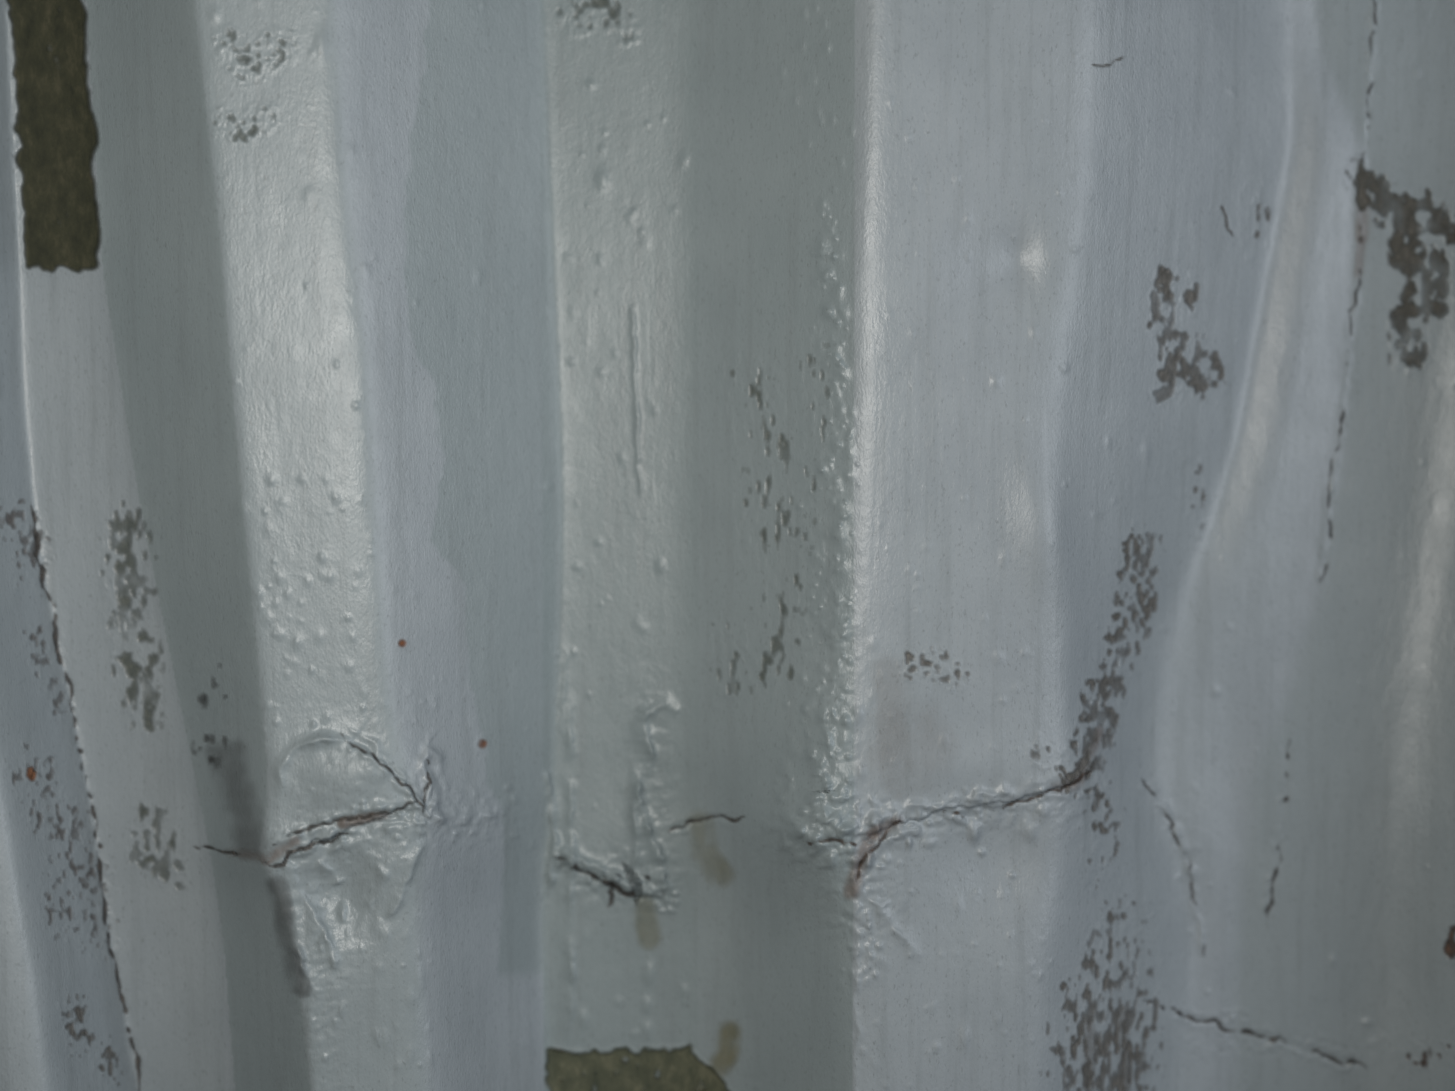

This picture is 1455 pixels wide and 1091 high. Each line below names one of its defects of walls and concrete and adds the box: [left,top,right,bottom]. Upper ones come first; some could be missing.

peeling [7,0,100,272]
peeling [1354,160,1455,334]
peeling [1148,266,1224,400]
crack [1324,412,1344,573]
peeling [1059,535,1157,833]
crack [272,745,431,868]
crack [559,857,650,905]
crack [809,821,900,878]
crack [1006,773,1088,806]
peeling [546,1045,728,1091]
peeling [1054,912,1162,1091]
crack [1151,1001,1280,1042]